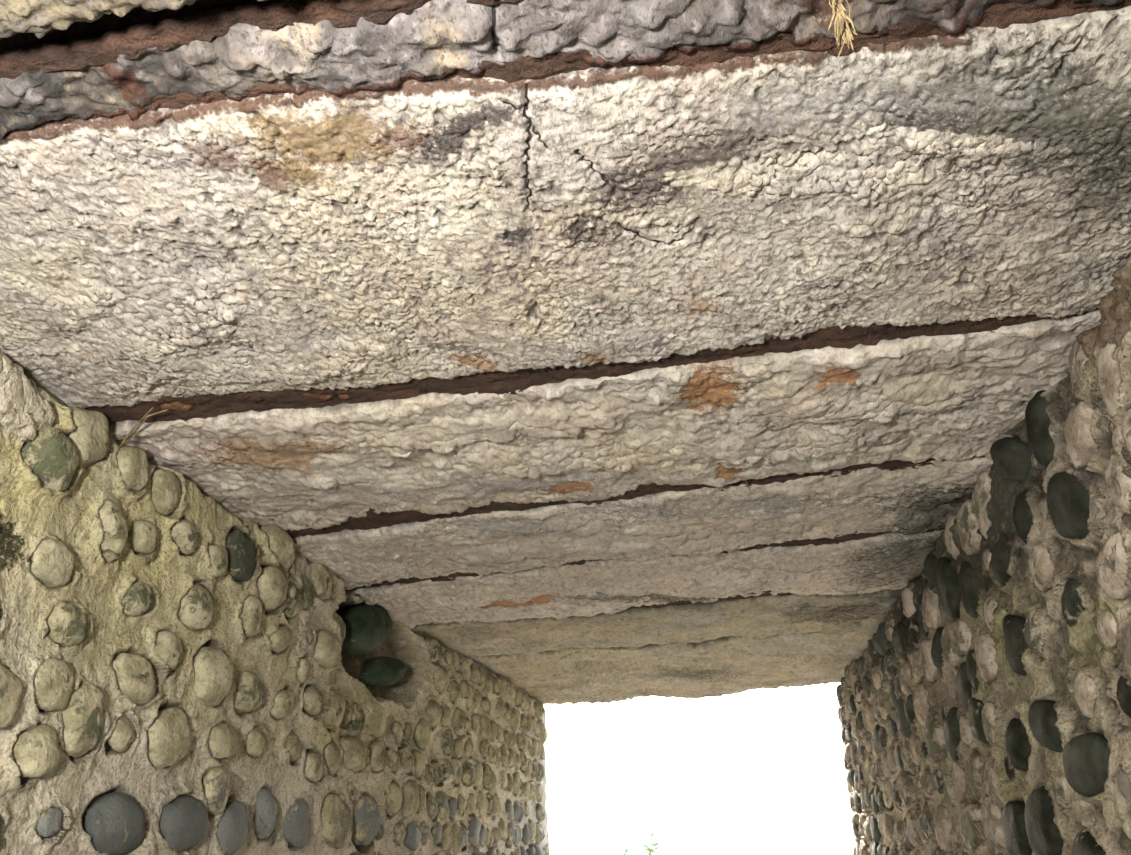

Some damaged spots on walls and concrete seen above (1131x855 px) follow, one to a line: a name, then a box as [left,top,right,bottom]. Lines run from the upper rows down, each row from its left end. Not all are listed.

crack [500,84,549,209]
crack [576,149,634,191]
rust [679,363,744,414]
rust [813,364,860,391]
rust [545,482,594,495]
rust [716,467,742,480]